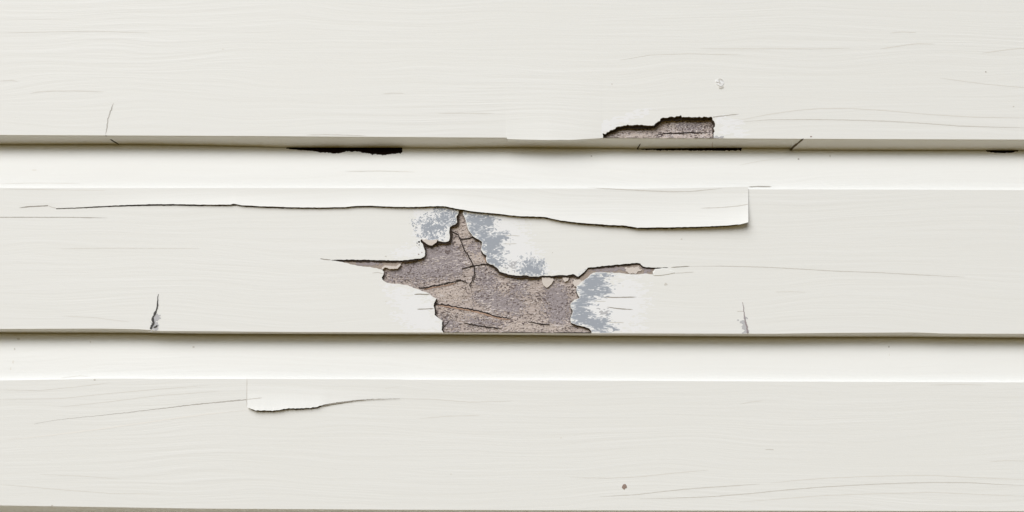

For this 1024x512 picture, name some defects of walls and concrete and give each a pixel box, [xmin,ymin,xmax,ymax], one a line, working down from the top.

peeling [542,277,583,288]
crack [71,297,158,329]